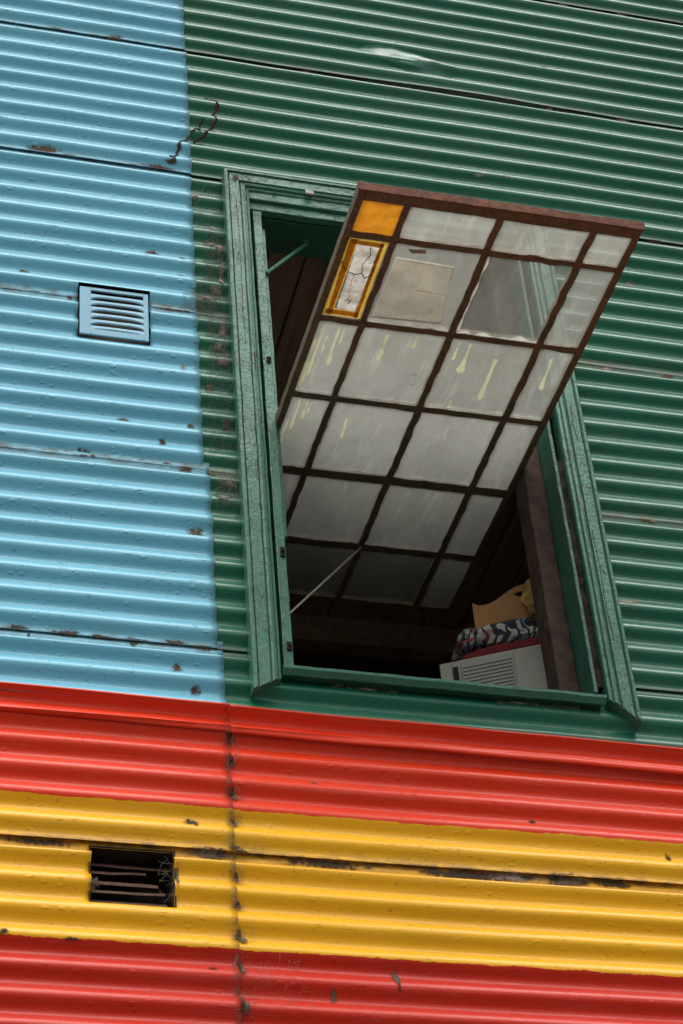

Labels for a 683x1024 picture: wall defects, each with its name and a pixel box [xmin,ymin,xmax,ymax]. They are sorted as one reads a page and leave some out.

corrosion [27,145,76,156]
crack [165,97,220,164]